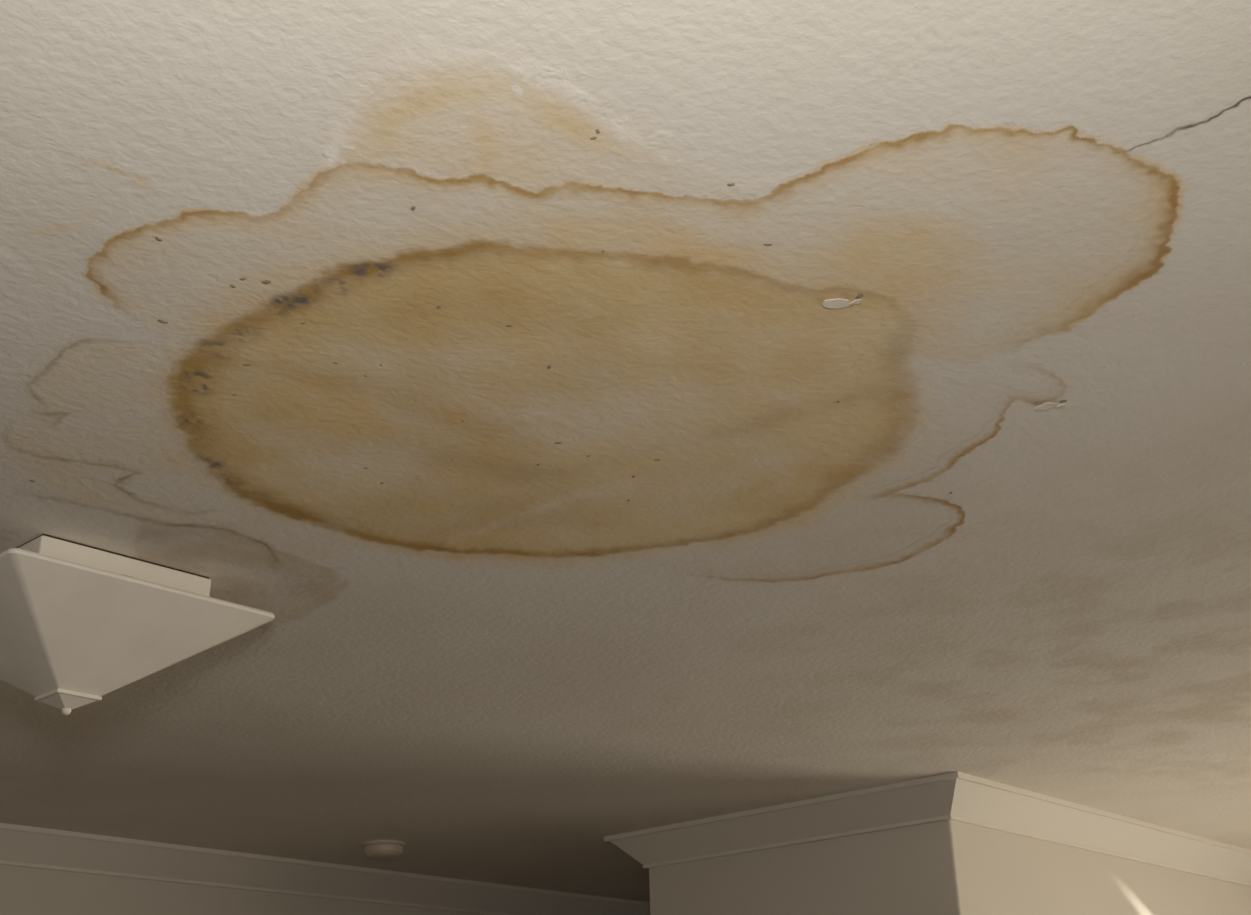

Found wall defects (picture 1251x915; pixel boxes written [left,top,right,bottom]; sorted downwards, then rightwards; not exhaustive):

crack [1128,94,1251,152]
peeling [822,293,864,309]
damp [0,35,1196,631]